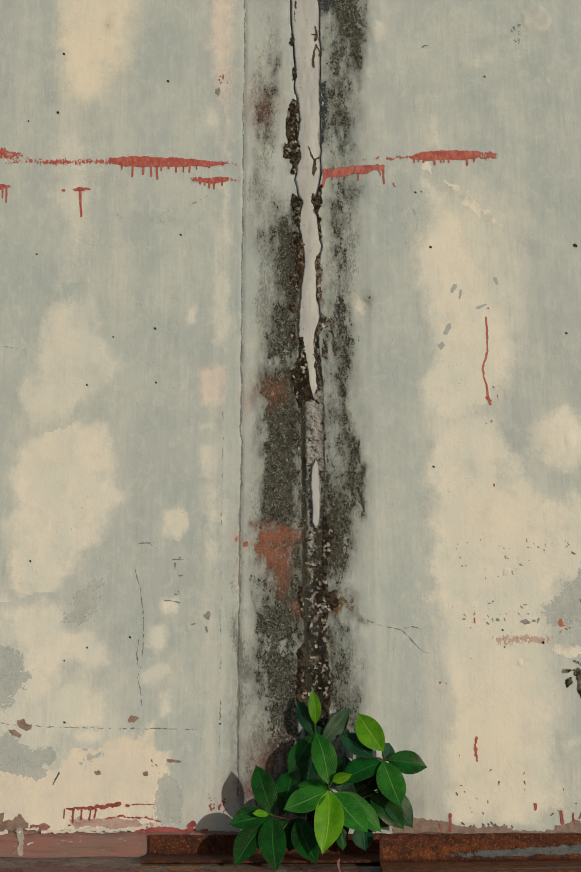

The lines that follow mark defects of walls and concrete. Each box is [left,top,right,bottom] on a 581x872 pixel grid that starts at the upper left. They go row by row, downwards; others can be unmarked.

peeling [182,0,246,365]
spalling [283,99,301,174]
peeling [311,26,321,68]
spalling [151,184,339,729]
leakage [243,0,367,818]
crack [301,399,310,707]
peeling [392,101,581,834]